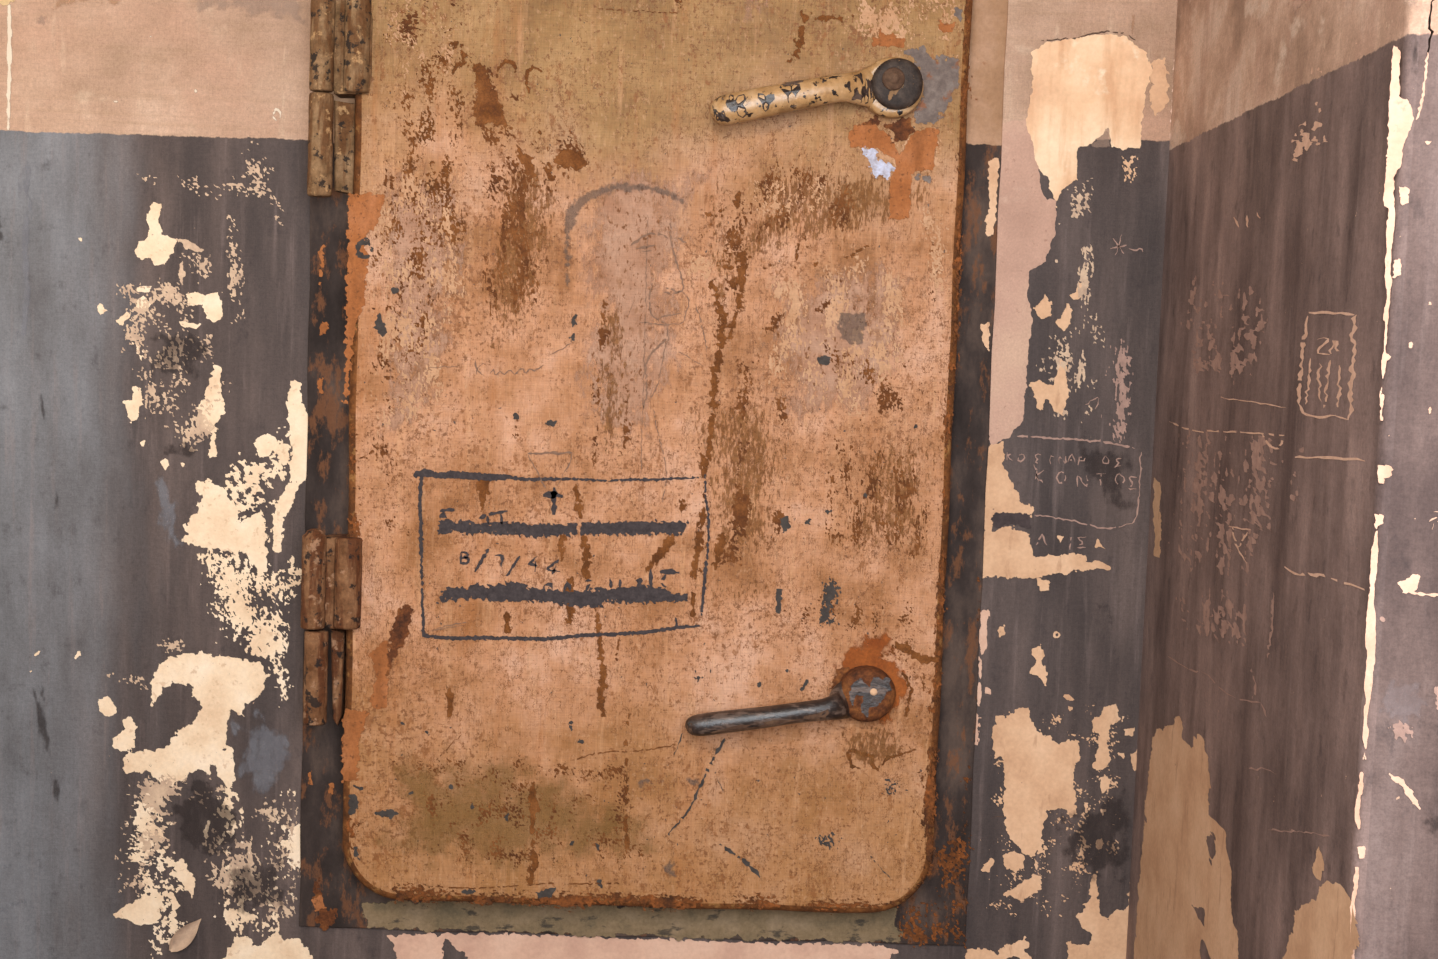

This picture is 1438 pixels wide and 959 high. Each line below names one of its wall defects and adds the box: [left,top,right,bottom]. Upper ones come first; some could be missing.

crack [1416,0,1434,120]
peeling [178,130,283,226]
corrosion [318,0,589,413]
corrosion [347,424,412,541]
corrosion [380,0,977,949]
peeling [1377,465,1393,484]
peeling [97,202,363,959]
peeling [1397,574,1420,594]
corrosion [340,604,414,783]
peeling [965,610,1239,959]
peeling [1355,753,1366,829]
peeling [1389,773,1421,810]